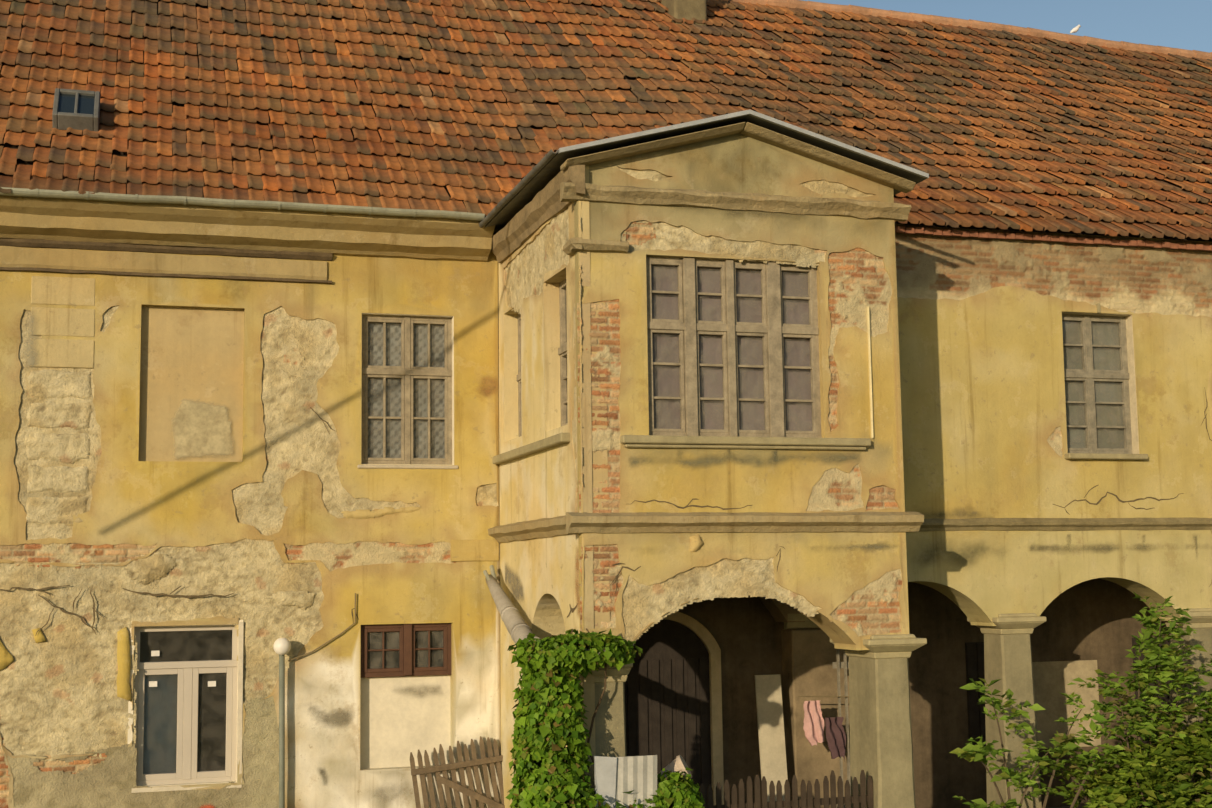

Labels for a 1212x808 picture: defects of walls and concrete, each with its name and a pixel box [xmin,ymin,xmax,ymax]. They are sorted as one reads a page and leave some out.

flaking render [505,209,582,314]
flaking render [620,220,1212,432]
flaking render [577,299,621,513]
flaking render [0,306,456,808]
crack [631,499,752,510]
flaking render [579,544,902,646]
flaking render [806,464,899,512]
crack [1053,485,1184,515]